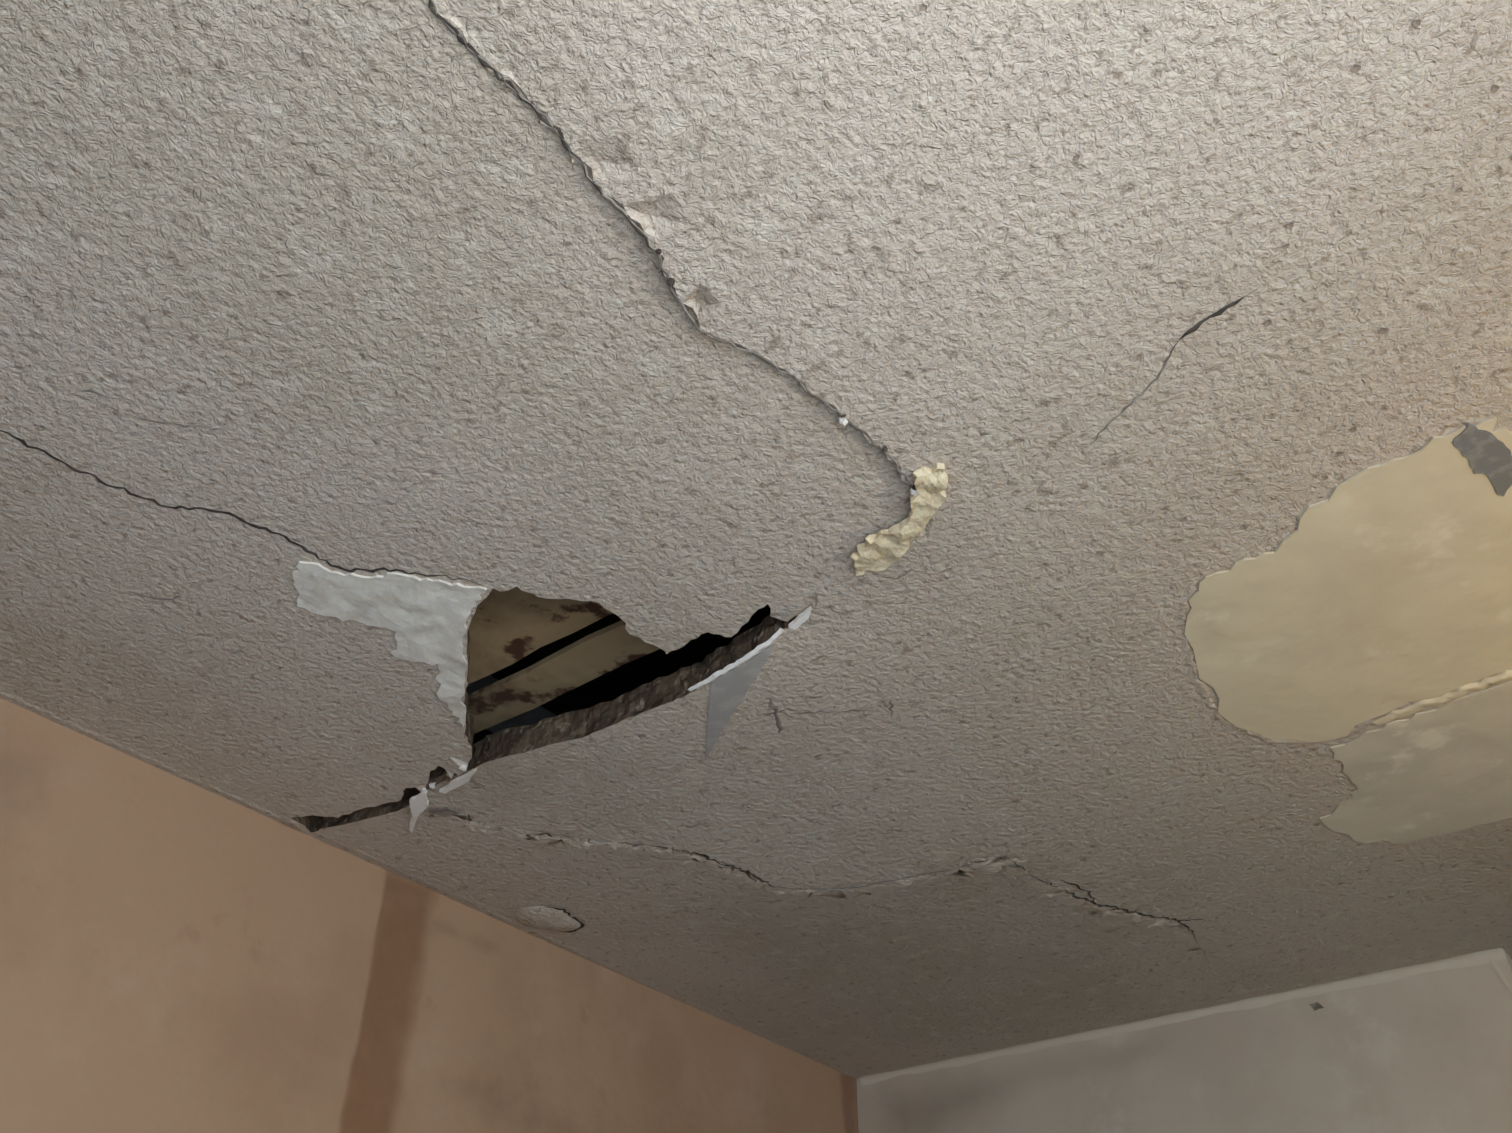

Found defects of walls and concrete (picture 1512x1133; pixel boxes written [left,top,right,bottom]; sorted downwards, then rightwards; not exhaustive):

crack [428,0,918,496]
crack [76,389,228,431]
crack [1090,289,1257,445]
crack [0,430,484,587]
flaking render [851,463,948,576]
crack [129,591,183,600]
flaking render [788,606,811,630]
peeling [1177,417,1512,844]
flaking render [706,643,775,759]
flaking render [409,768,477,833]